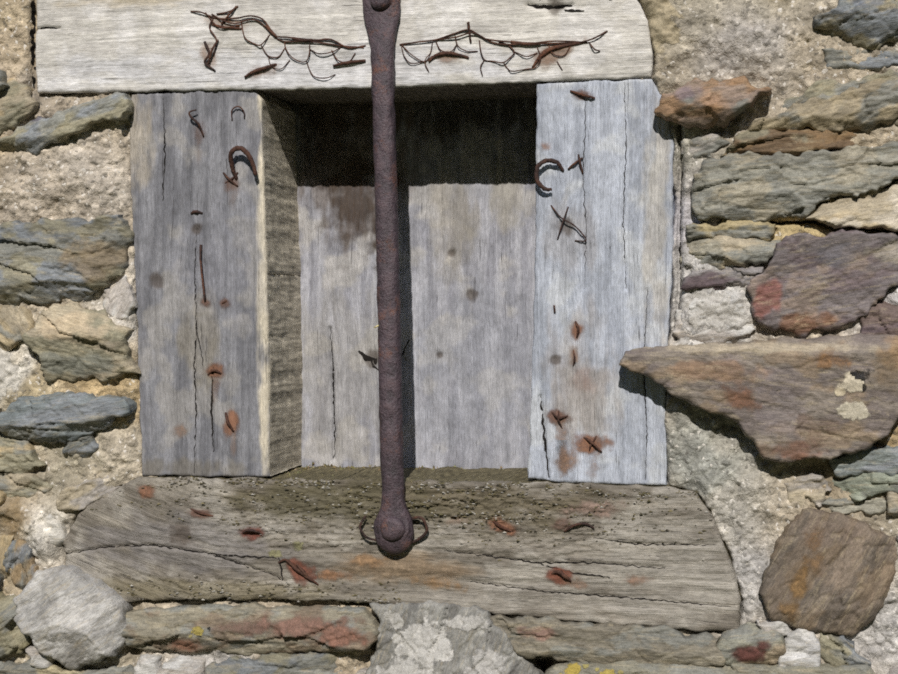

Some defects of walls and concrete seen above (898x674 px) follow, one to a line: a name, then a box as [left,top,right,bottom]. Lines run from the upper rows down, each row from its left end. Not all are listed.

crack [528,4,584,12]
crack [29,0,57,88]
crack [193,230,214,467]
corrosion [571,323,582,361]
corrosion [547,410,612,472]
corrosion [241,528,263,540]
crack [66,544,285,581]
corrosion [287,554,458,586]
corrosion [546,568,585,587]
crack [444,537,731,607]